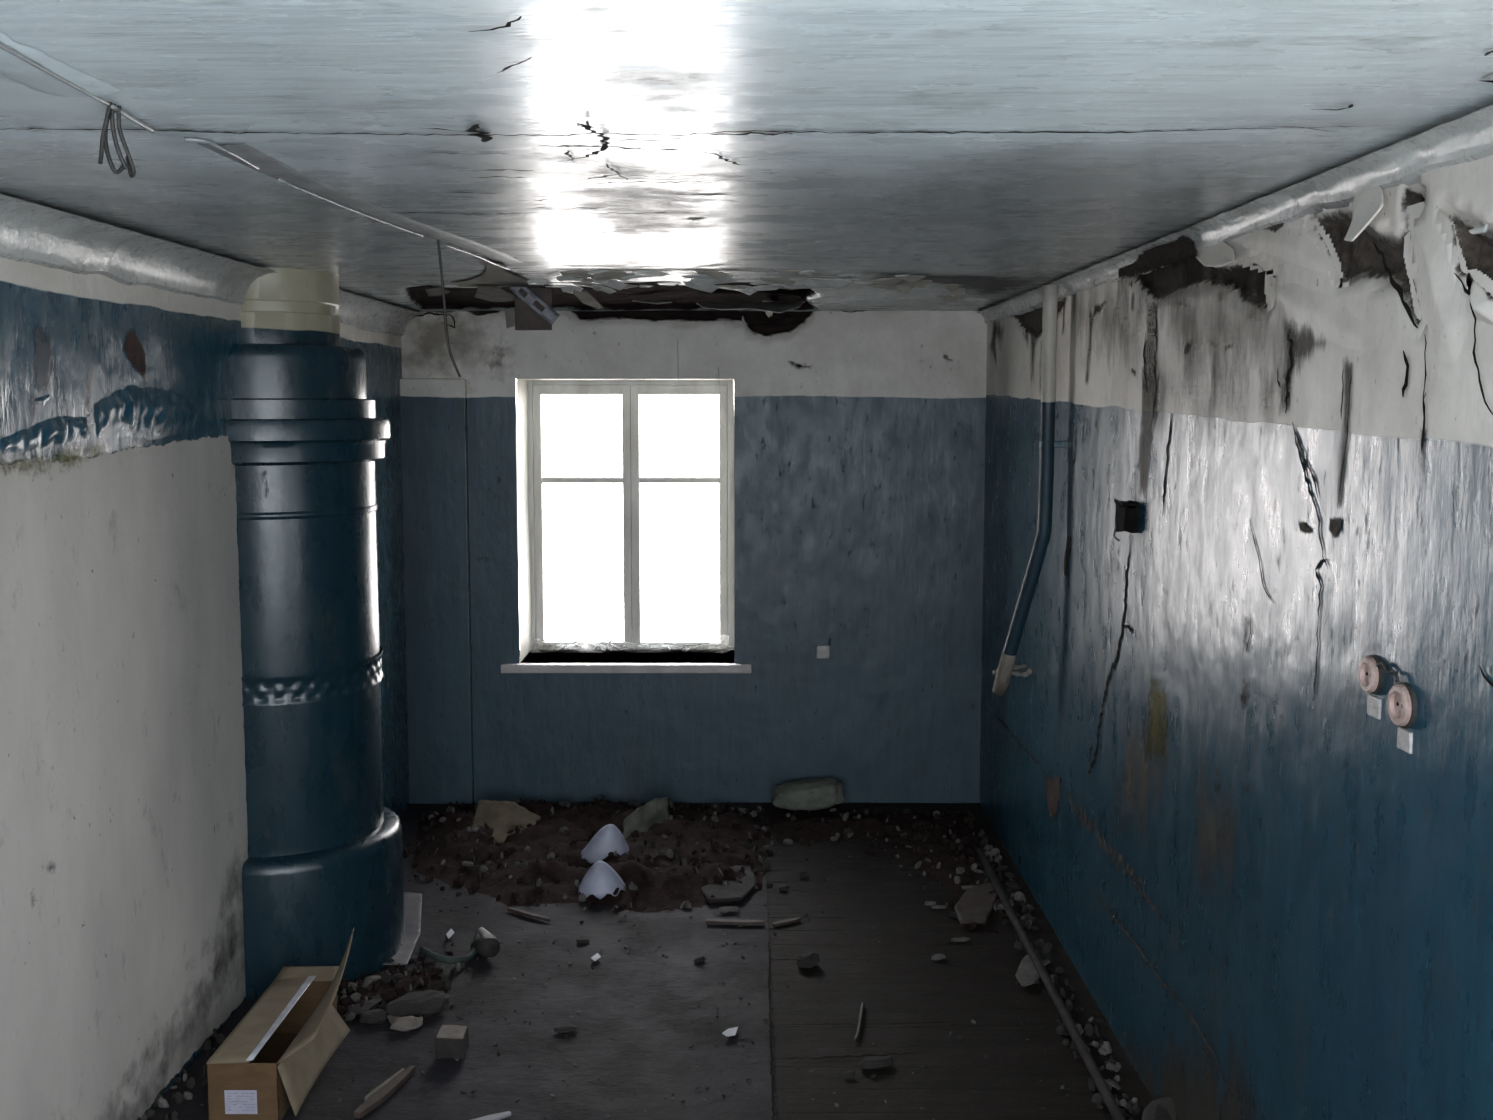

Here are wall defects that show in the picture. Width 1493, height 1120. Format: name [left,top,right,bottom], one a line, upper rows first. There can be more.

crack [0,104,1355,215]
flaking render [406,262,1036,336]
damp [1063,294,1092,383]
flaking render [1102,235,1267,308]
damp [1282,326,1314,407]
flaking render [1318,186,1425,325]
crack [1373,242,1427,454]
flaking render [1450,216,1493,300]
crack [1454,273,1493,415]
damp [1337,362,1352,505]
crack [1277,330,1352,699]
crack [1246,522,1273,652]